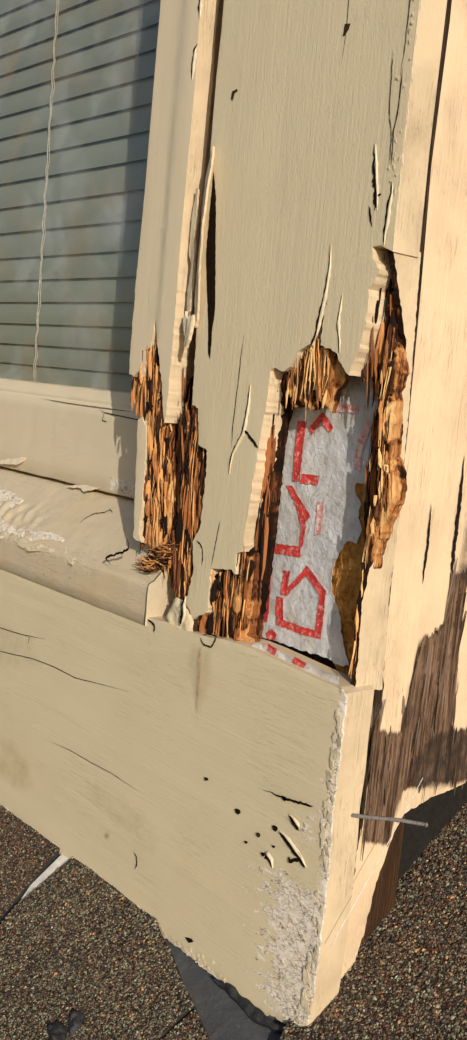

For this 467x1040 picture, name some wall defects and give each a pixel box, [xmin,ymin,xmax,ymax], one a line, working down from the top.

crack [369,0,411,244]
peeling [183,146,215,348]
crack [229,337,258,474]
peeling [0,488,77,565]
crack [261,790,312,869]
peeling [237,687,348,1025]
leakage [410,735,467,787]